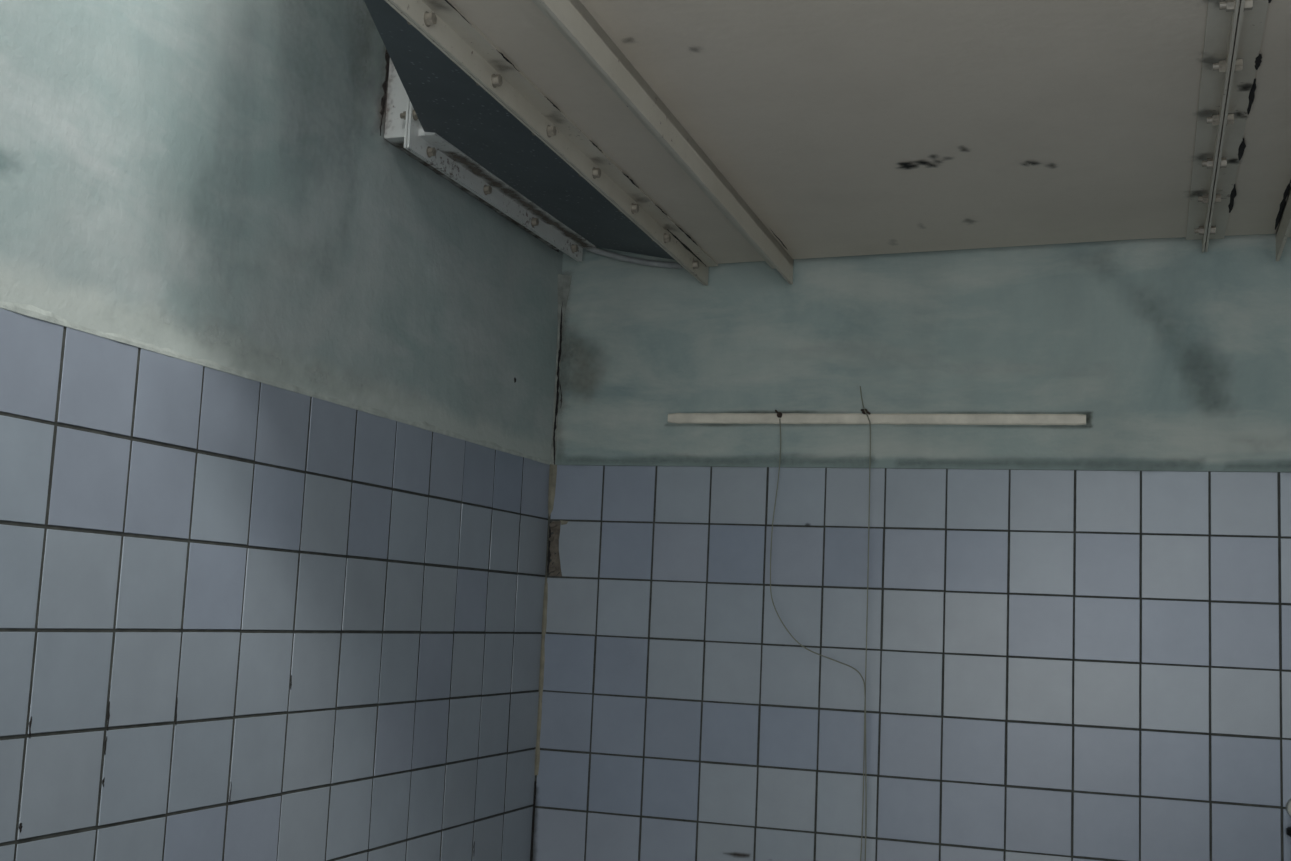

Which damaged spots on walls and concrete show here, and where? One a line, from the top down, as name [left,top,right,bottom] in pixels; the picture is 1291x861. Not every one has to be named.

spalling [547,520,568,576]